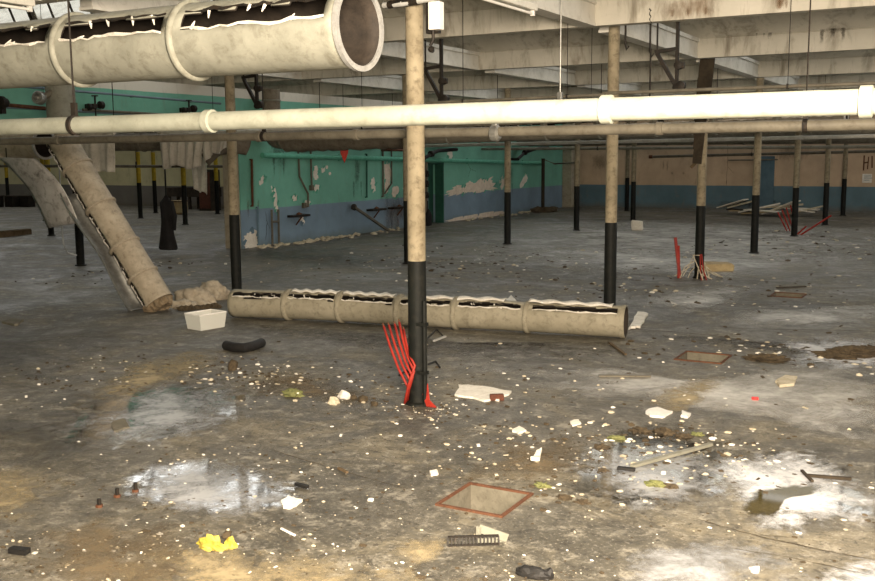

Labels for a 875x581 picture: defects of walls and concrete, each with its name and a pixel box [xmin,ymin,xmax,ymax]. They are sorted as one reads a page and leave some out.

peeling [290,165,331,205]
peeling [445,176,504,196]